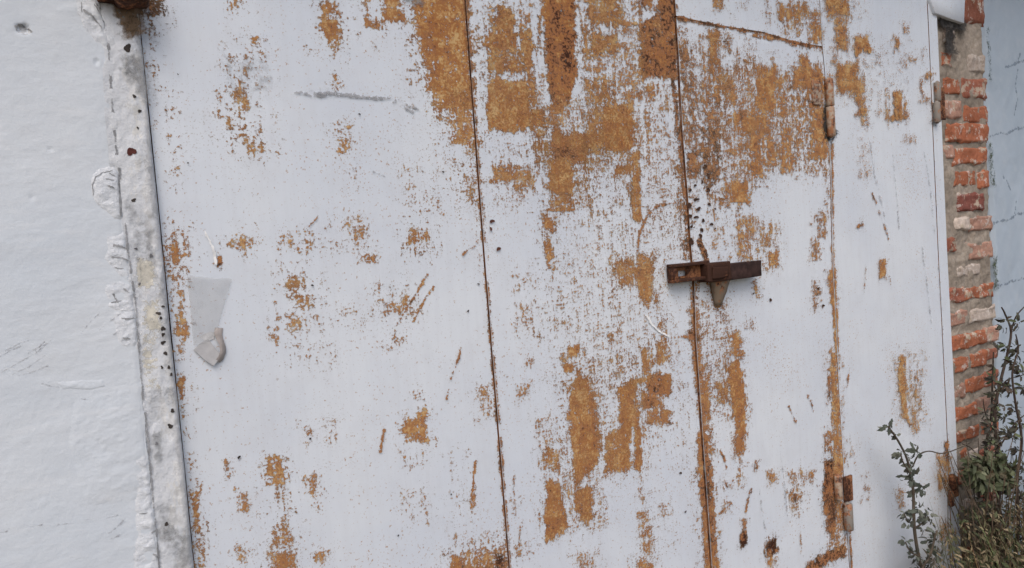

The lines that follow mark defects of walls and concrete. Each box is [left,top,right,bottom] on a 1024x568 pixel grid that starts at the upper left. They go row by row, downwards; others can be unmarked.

rust [212,33,281,164]
spalling [105,232,173,388]
rust [266,0,936,568]
rust [162,211,260,568]
rust [223,450,341,568]